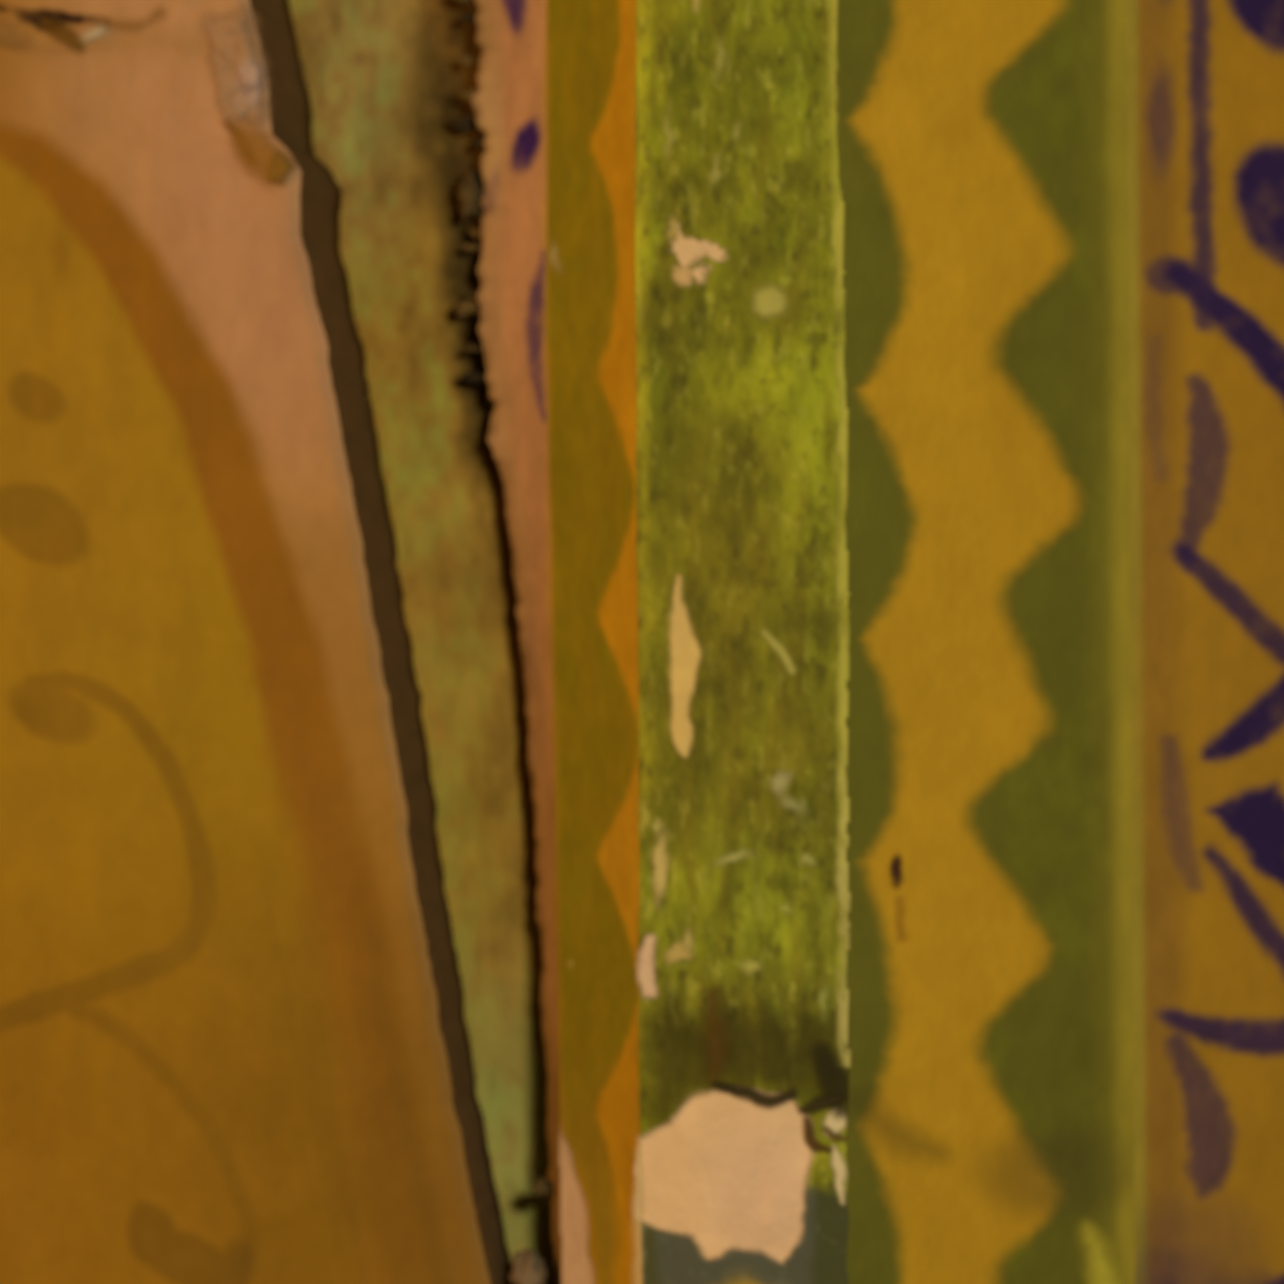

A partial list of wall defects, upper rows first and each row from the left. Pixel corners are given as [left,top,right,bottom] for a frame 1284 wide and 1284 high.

crack [0,7,105,50]
flaking render [203,9,293,183]
peeling [669,220,727,285]
peeling [670,575,701,757]
peeling [509,1133,594,1284]
peeling [635,1082,846,1263]